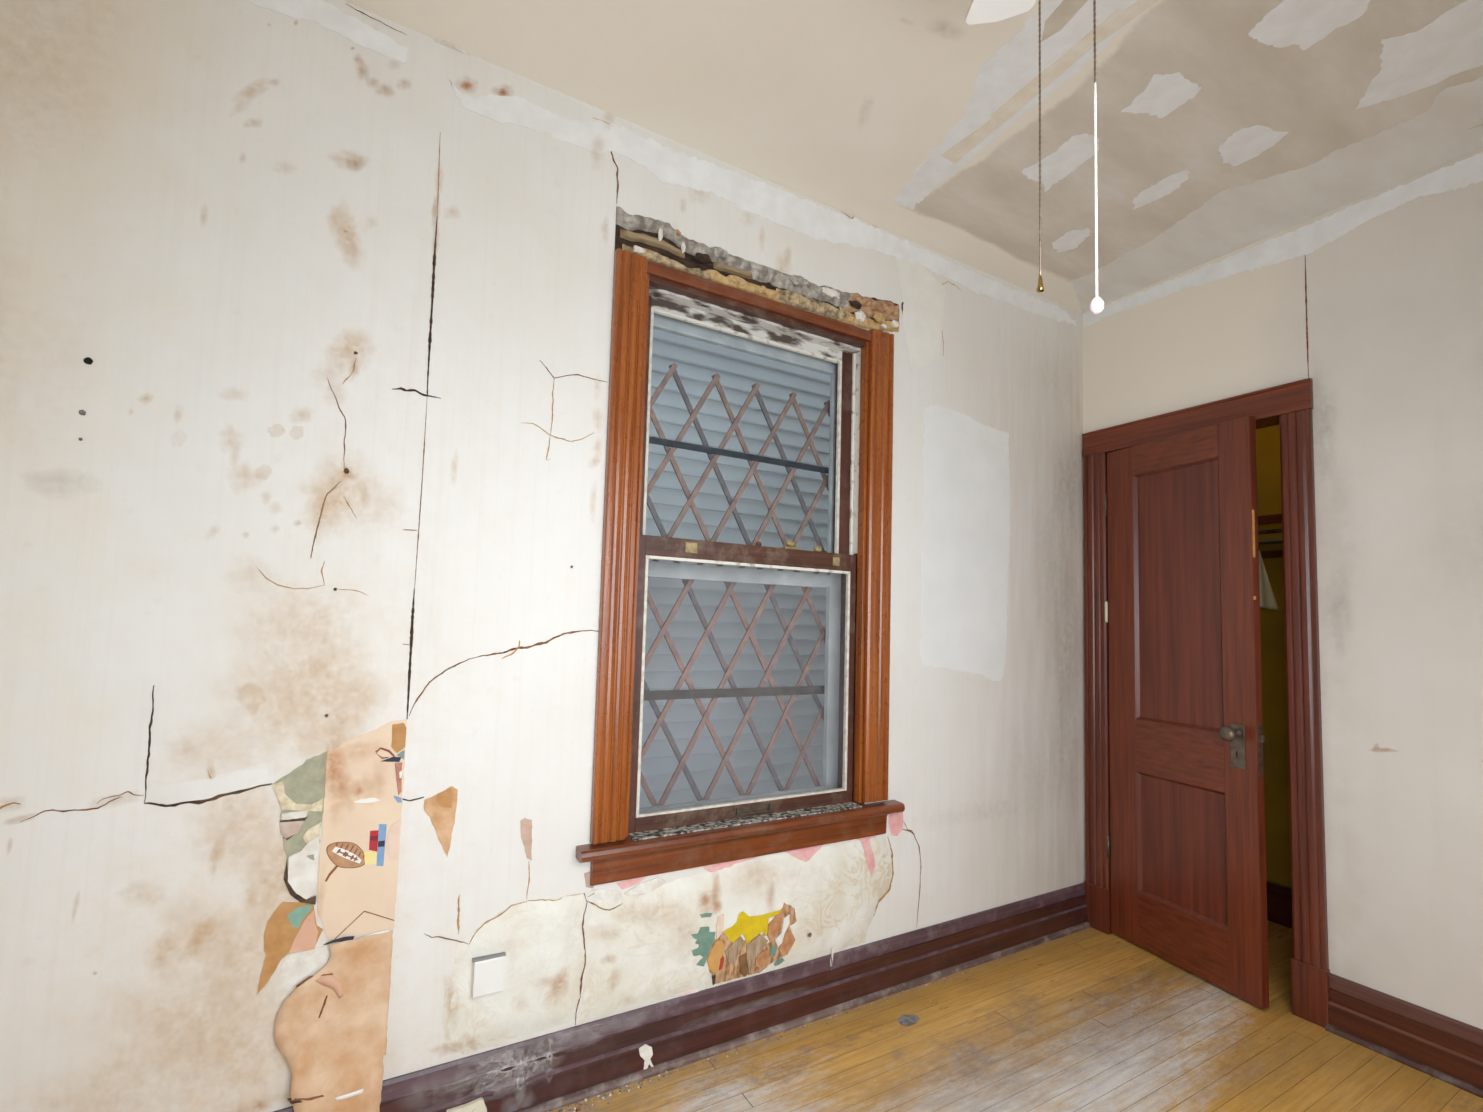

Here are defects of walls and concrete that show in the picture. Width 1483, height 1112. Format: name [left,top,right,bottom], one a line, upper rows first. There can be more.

crack [592,117,619,201]
peeling [633,228,663,253]
peeling [822,287,840,299]
peeling [854,310,899,329]
crack [394,144,606,719]
crack [259,357,366,595]
crack [0,685,274,822]
peeling [383,723,406,762]
peeling [436,788,453,808]
flaking render [272,751,328,928]
flaking render [275,945,329,1004]
peeling [691,903,797,985]